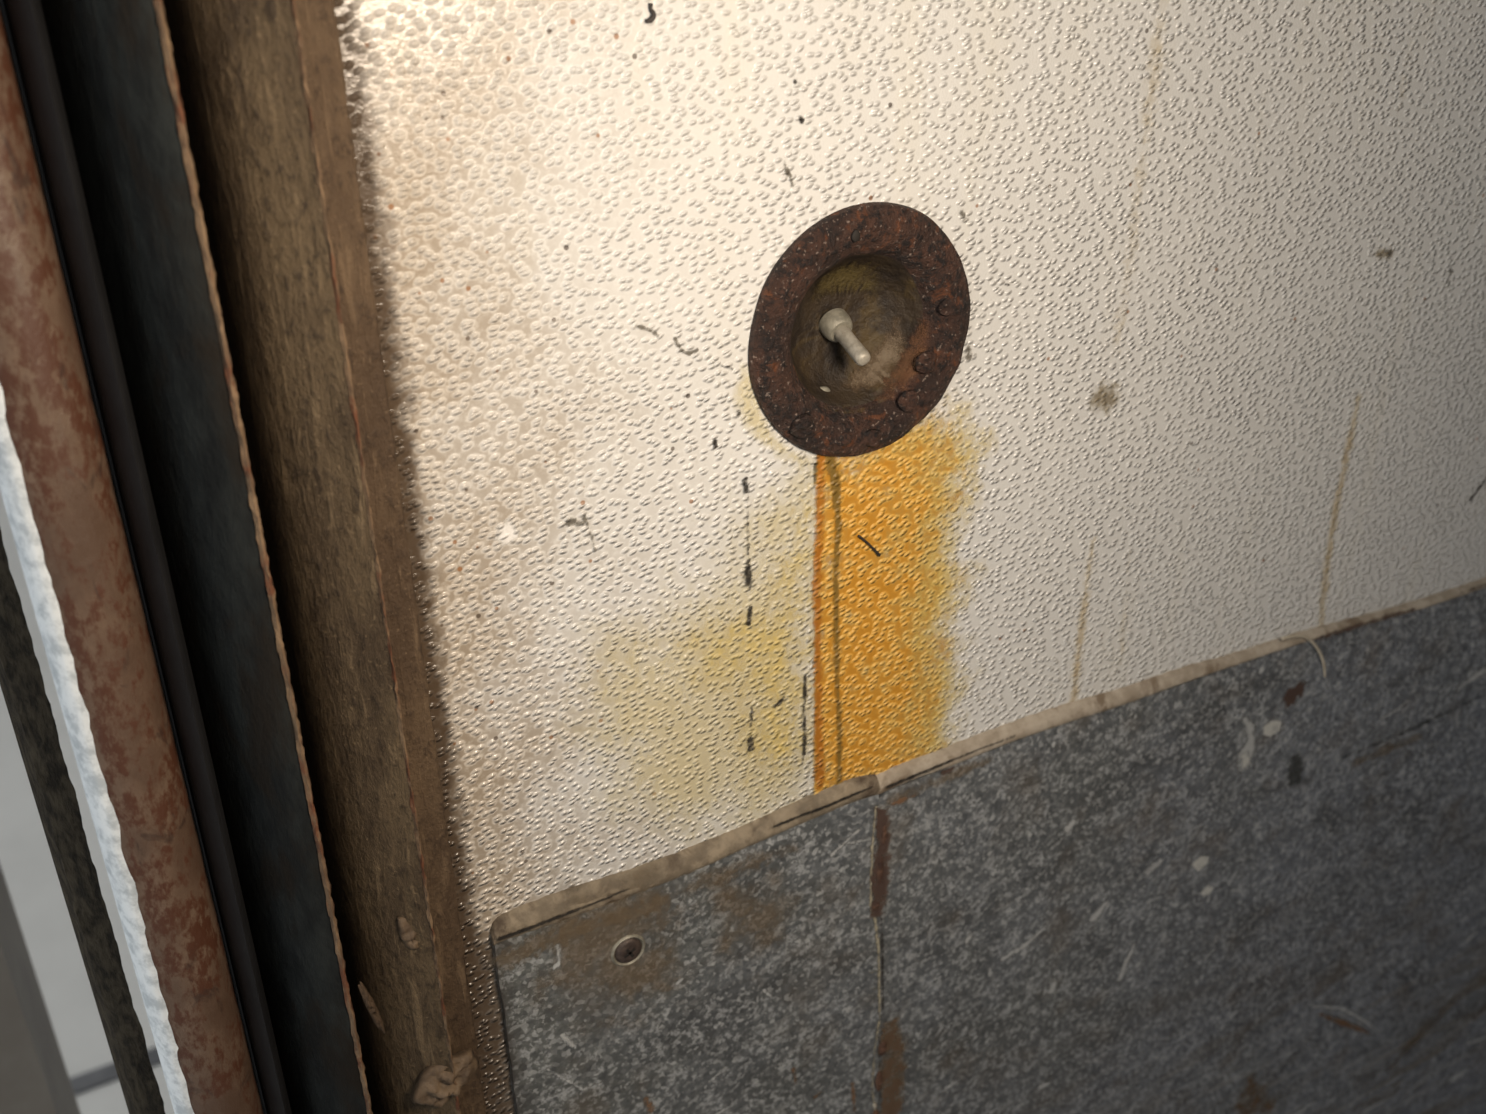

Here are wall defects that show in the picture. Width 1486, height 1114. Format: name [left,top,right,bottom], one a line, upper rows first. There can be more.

rust [153,0,373,1114]
rust [812,423,977,795]